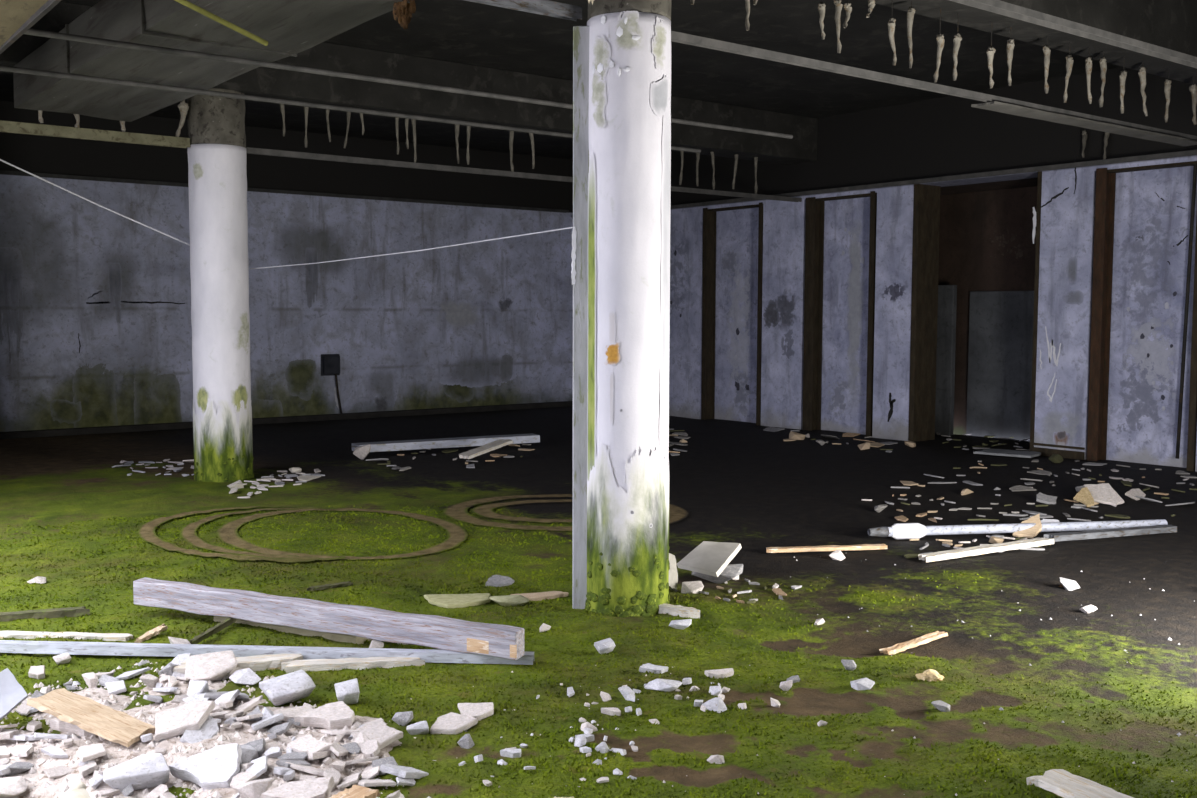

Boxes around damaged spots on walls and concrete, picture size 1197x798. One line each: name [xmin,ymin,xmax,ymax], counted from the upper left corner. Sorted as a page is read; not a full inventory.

peeling [592,11,669,117]
corrosion [604,311,621,425]